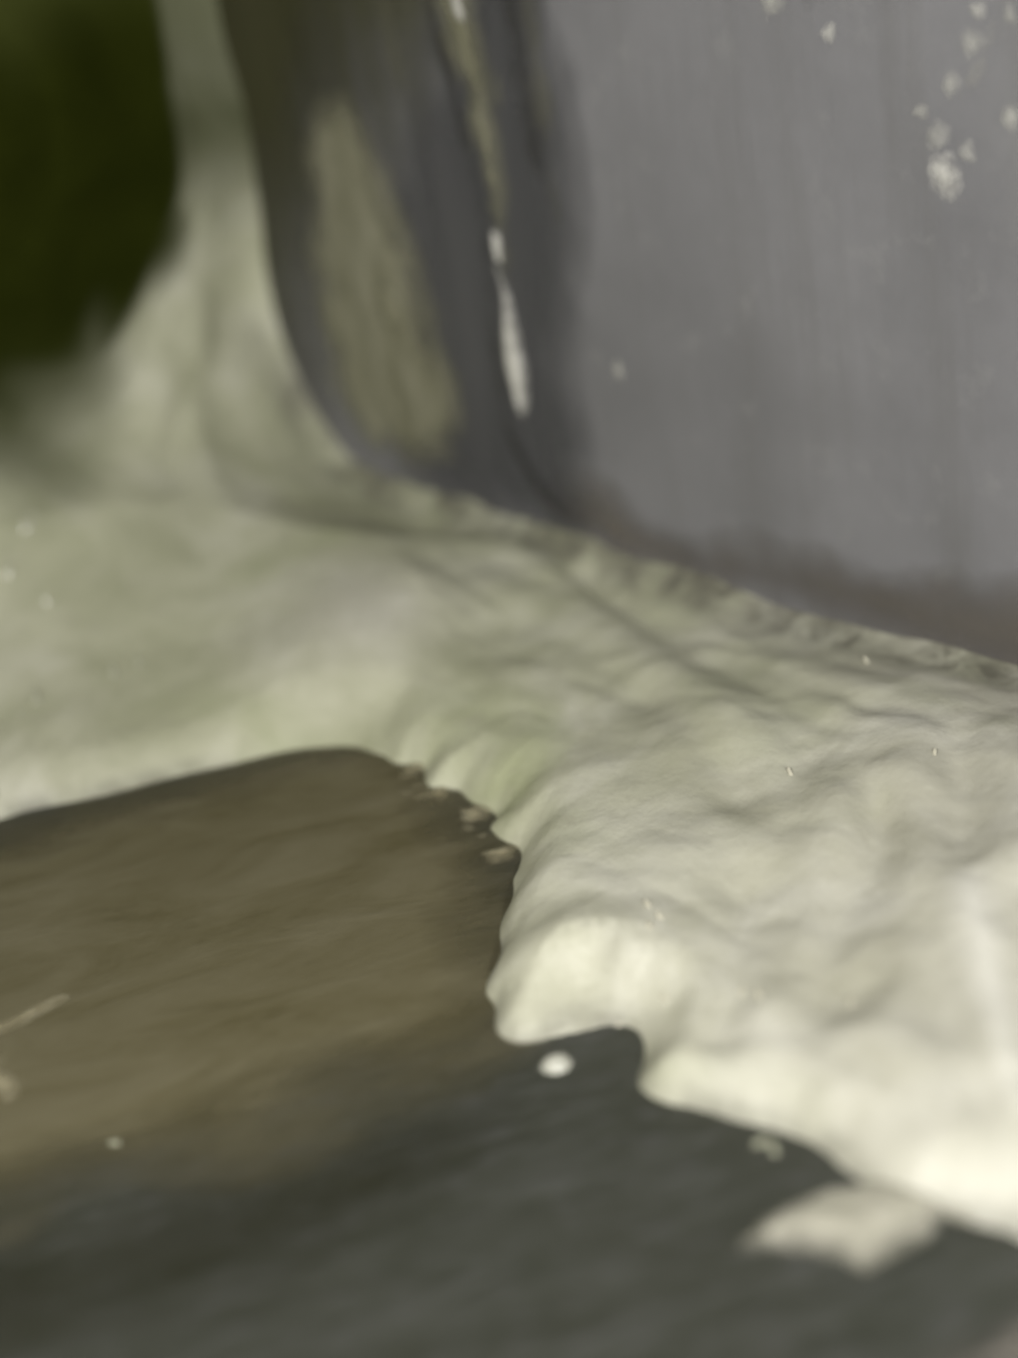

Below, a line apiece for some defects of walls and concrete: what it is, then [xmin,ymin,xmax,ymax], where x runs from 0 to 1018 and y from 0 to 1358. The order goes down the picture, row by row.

damp [0,0,1018,692]
damp [0,512,1018,1237]